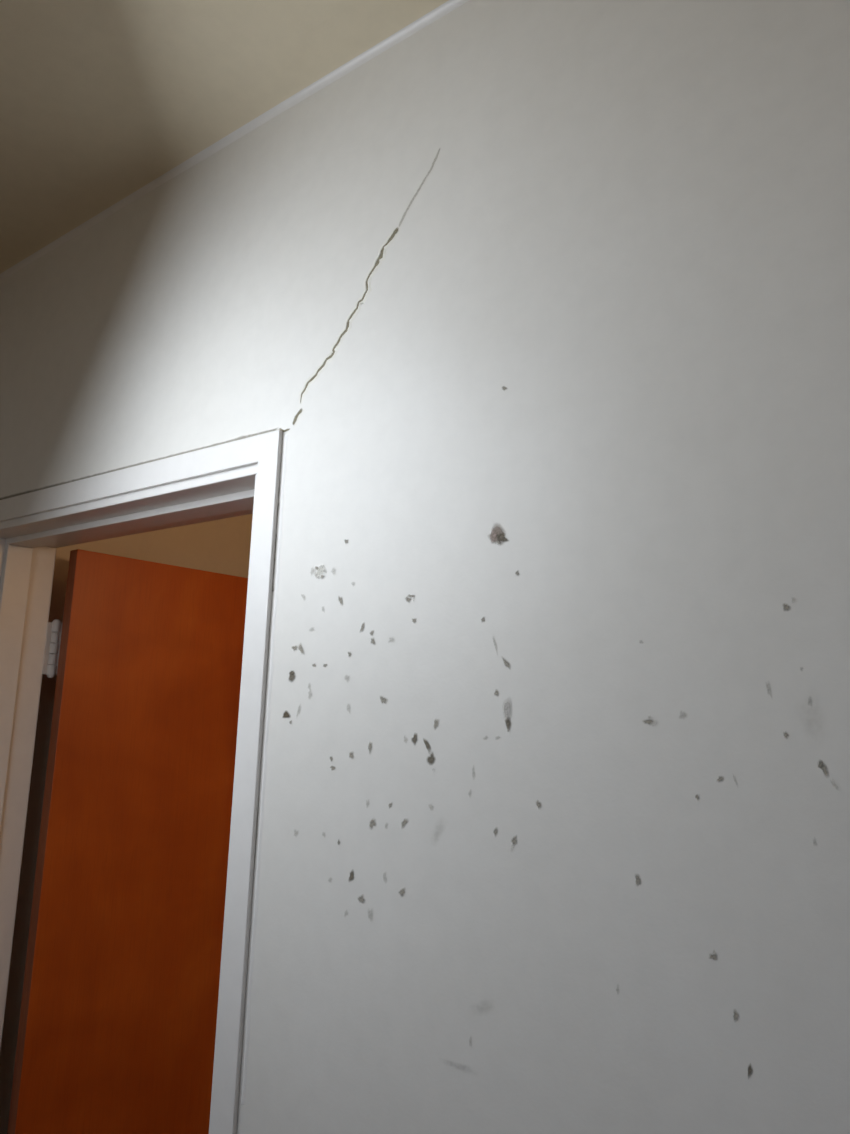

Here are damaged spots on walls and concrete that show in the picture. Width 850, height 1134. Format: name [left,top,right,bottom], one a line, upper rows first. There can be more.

crack [0,226,400,500]
spalling [490,526,507,544]
peeling [494,691,510,729]